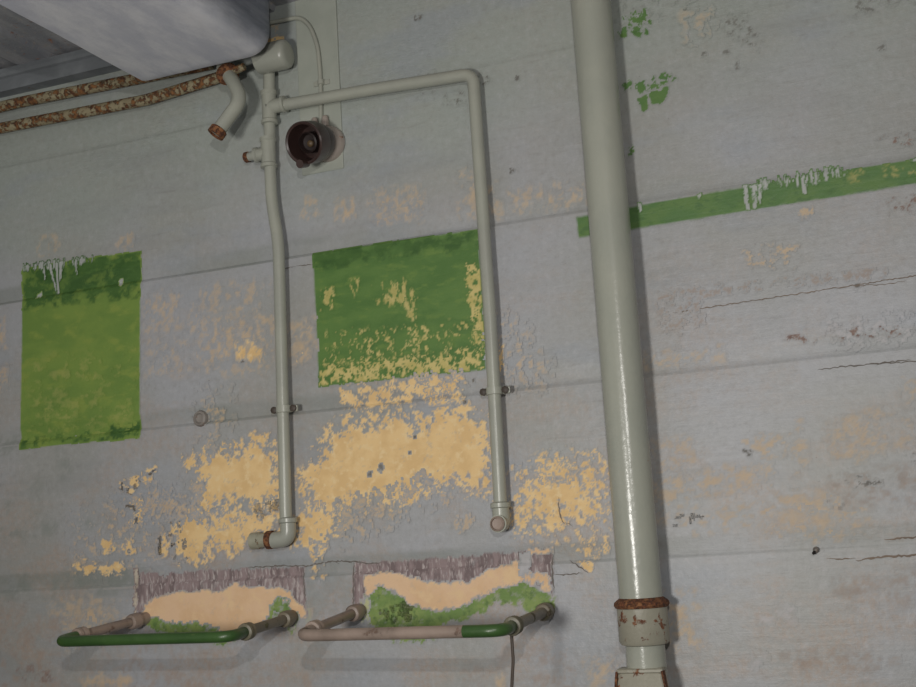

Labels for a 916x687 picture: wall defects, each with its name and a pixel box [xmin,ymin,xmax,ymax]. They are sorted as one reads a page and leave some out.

peeling [611,0,698,40]
peeling [621,71,678,113]
crack [682,275,916,312]
peeling [496,304,557,399]
peeling [0,274,319,687]
peeling [286,368,494,583]
peeling [501,442,614,573]
crack [829,536,916,561]
peeling [459,631,626,687]